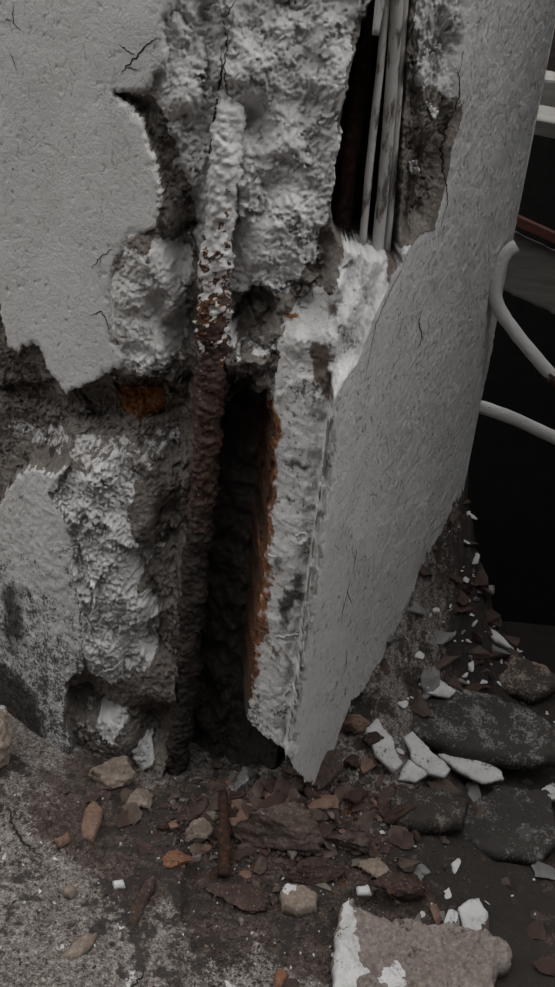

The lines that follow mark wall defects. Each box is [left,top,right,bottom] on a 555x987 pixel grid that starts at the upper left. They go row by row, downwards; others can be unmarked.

crack [118,35,161,72]
spalling [391,0,469,261]
spalling [0,0,390,781]
flaking render [422,680,456,699]